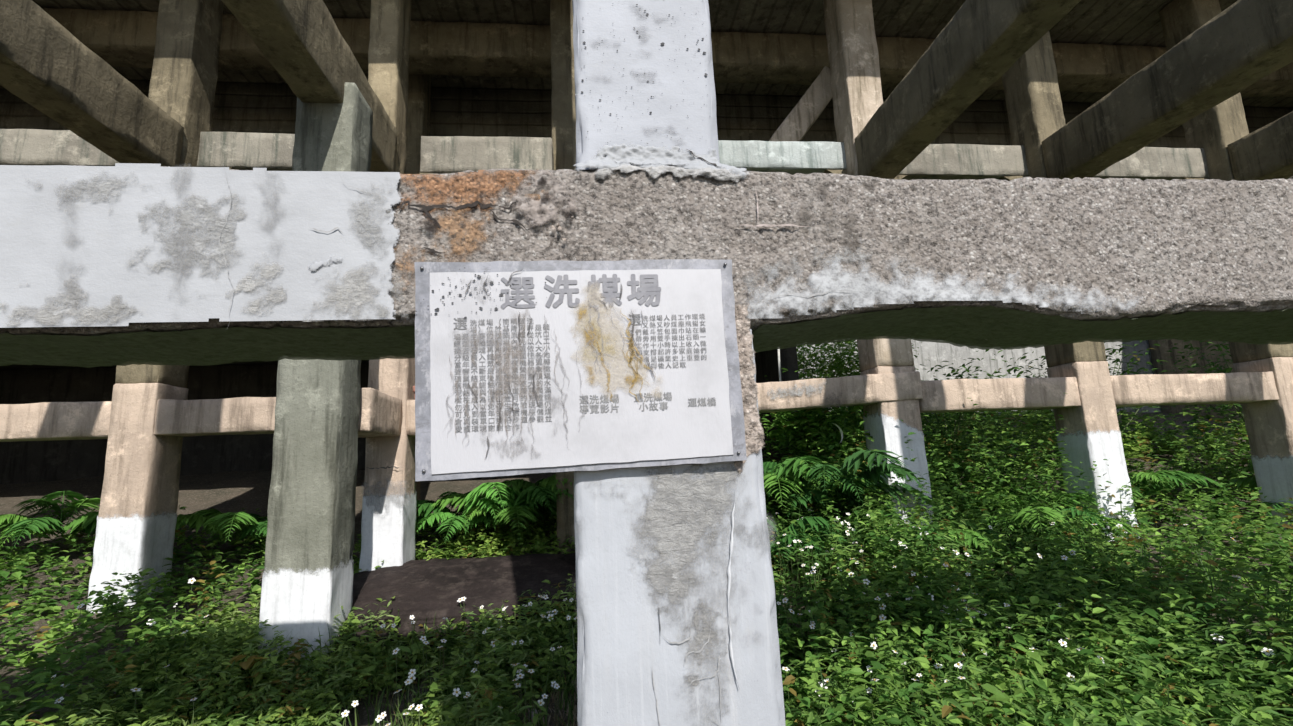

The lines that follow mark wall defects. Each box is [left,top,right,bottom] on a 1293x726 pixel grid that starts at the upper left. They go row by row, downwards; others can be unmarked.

peeling [0,163,403,328]
spalling [419,218,437,232]
rust [400,170,541,262]
spalling [513,170,581,242]
peeling [634,253,1136,686]